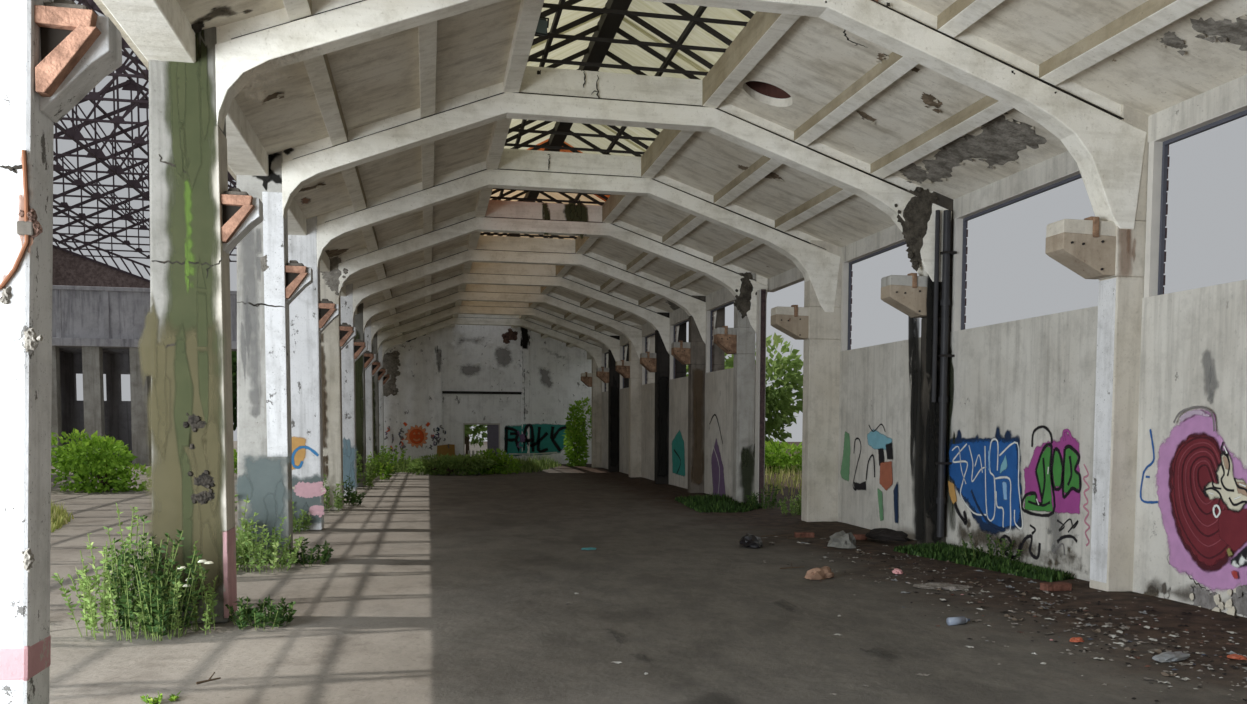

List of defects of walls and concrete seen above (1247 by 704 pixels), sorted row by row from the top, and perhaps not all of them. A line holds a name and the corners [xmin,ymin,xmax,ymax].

leakage [170,6,252,190]
peeling [1157,15,1247,56]
rust [0,150,34,290]
peeling [894,112,1047,271]
spalling [285,249,401,397]
leakage [1203,352,1217,403]